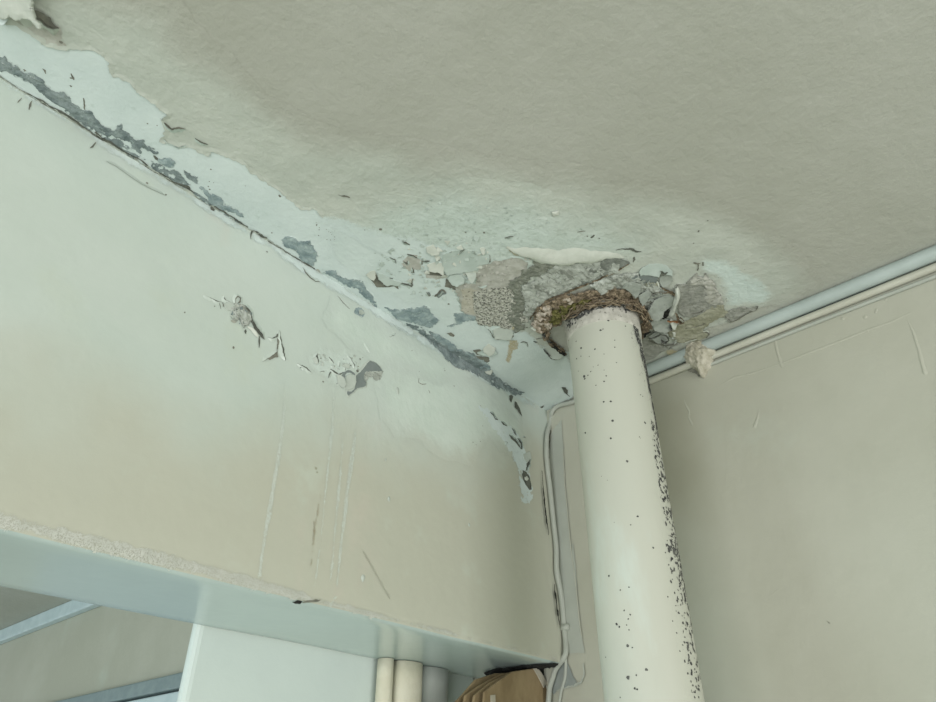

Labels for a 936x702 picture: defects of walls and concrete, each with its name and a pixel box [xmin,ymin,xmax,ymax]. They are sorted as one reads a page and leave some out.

peeling [0,0,780,416]
peeling [478,406,533,504]